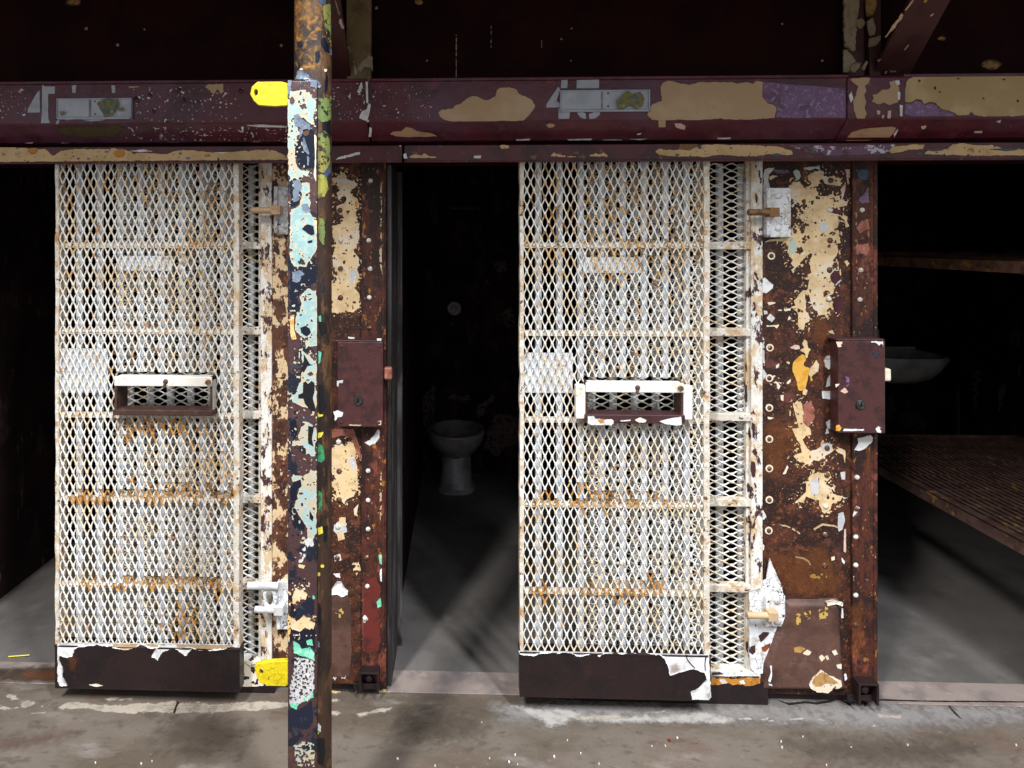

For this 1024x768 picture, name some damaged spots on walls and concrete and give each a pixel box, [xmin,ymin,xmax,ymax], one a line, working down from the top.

rust [295,2,321,68]
peeling [0,0,381,569]
peeling [647,0,1024,564]
rust [68,418,234,506]
rust [533,481,670,515]
rust [530,579,550,603]
rust [580,572,665,604]
peeling [748,545,783,686]
peeling [57,642,240,686]
peeling [288,554,382,767]
peeling [519,651,711,700]
peeling [794,646,847,693]